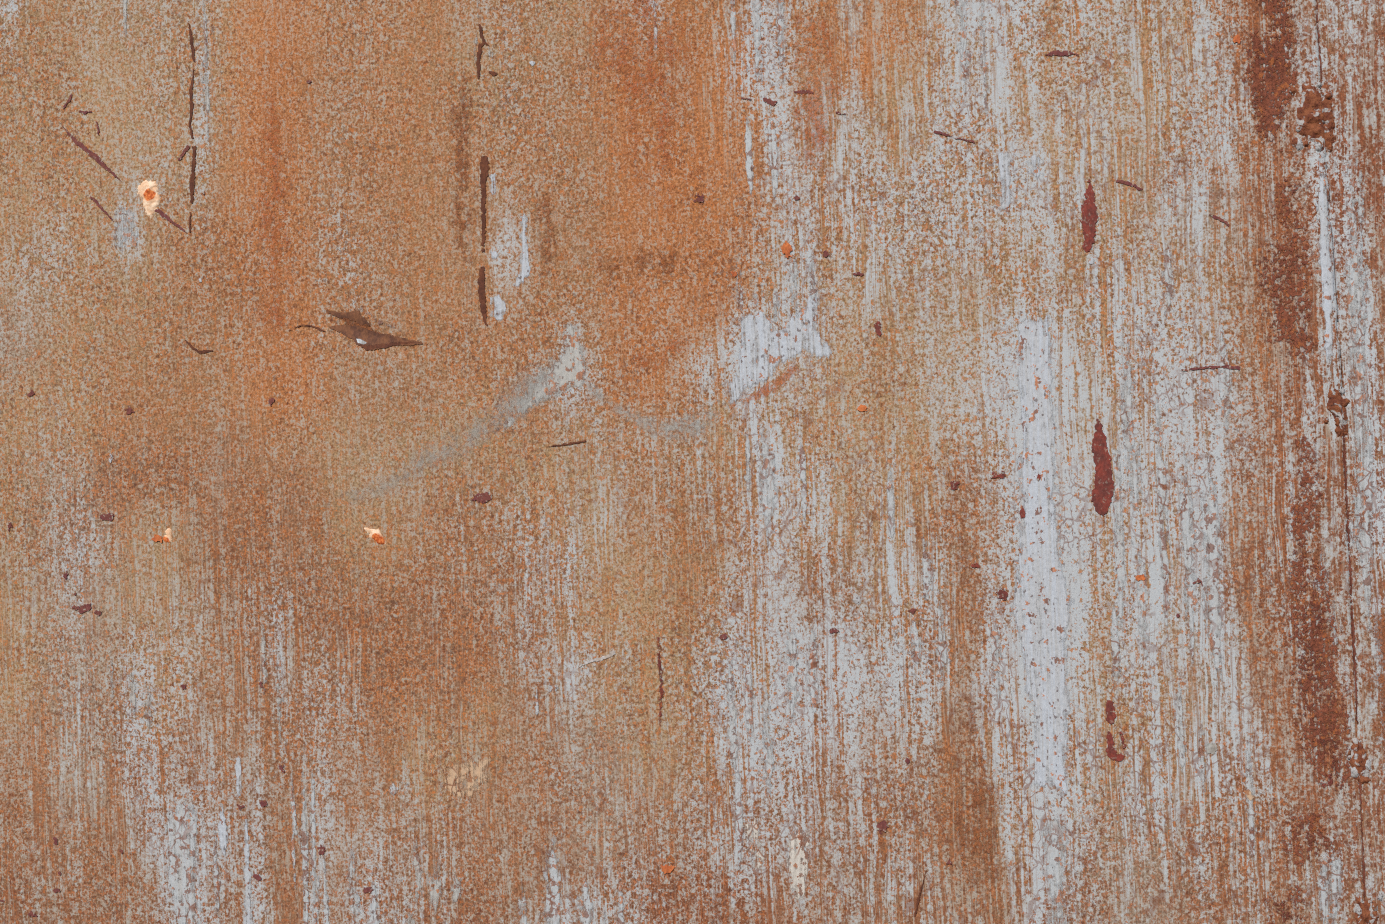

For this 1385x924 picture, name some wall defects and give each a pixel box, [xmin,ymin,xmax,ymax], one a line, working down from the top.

corrosion [450,75,476,262]
peeling [745,105,778,198]
peeling [728,250,832,405]
peeling [1080,178,1099,264]
corrosion [1233,0,1301,152]
corrosion [1253,179,1318,361]
peeling [990,315,1072,794]
peeling [1091,339,1223,693]
peeling [1106,700,1126,761]
corrosion [1282,436,1385,900]
peeling [785,828,810,908]
corrosion [1263,807,1338,924]